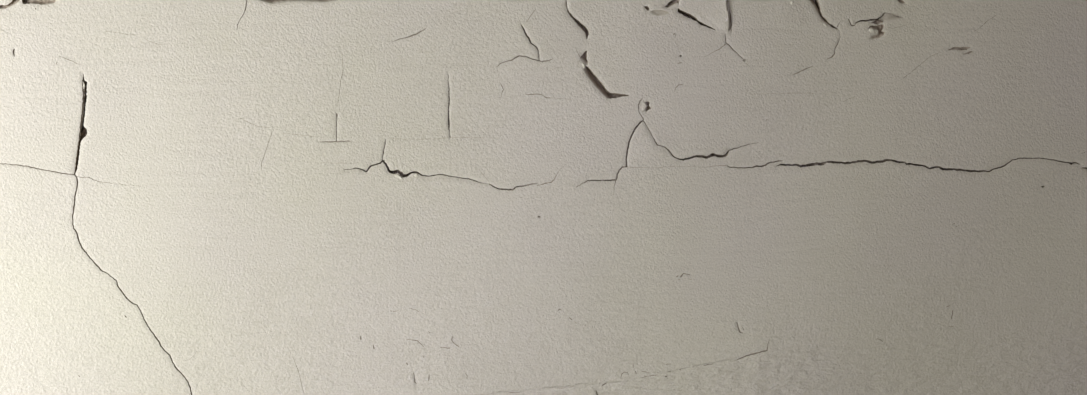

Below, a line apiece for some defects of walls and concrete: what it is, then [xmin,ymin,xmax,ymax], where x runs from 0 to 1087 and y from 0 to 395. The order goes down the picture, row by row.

peeling [644,0,732,32]
flaking render [849,0,906,39]
crack [244,49,347,167]
crack [344,0,1087,195]
crack [0,56,192,395]